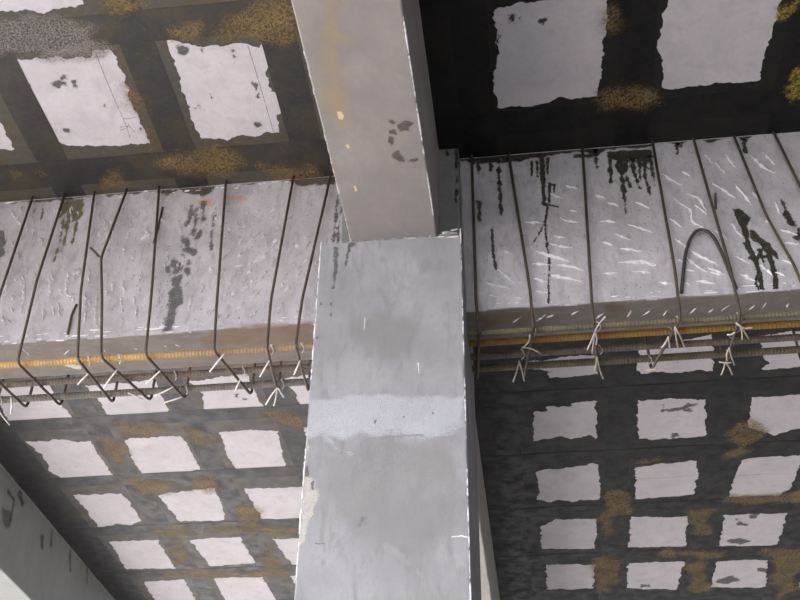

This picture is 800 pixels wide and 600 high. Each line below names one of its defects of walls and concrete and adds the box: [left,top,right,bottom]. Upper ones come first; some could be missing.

damp [50,73,78,90]
damp [586,75,667,115]
damp [10,78,336,331]
damp [445,144,656,304]
spalling [674,193,707,228]
spalling [712,183,758,205]
spalling [533,236,584,293]
spalling [602,234,656,275]
spalling [675,239,725,294]
spalling [0,235,332,403]
rust [201,321,314,347]
spalling [462,298,800,421]